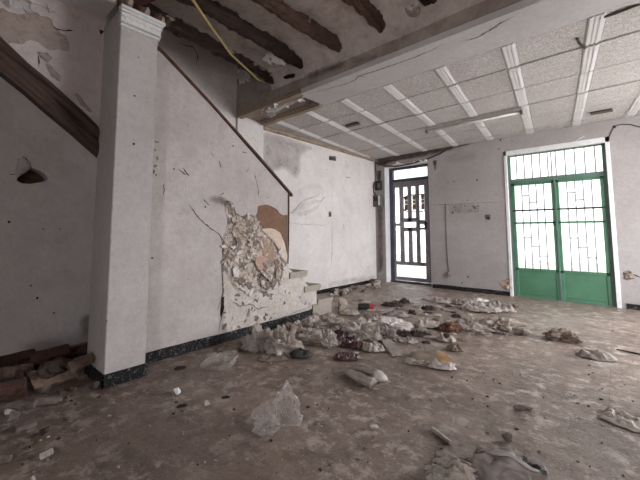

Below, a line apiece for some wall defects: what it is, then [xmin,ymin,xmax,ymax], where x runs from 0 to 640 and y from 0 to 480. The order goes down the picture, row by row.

flaking render [0,0,70,82]
flaking render [263,52,290,66]
spalling [10,156,44,184]
crack [189,193,229,328]
flaking render [221,195,326,332]